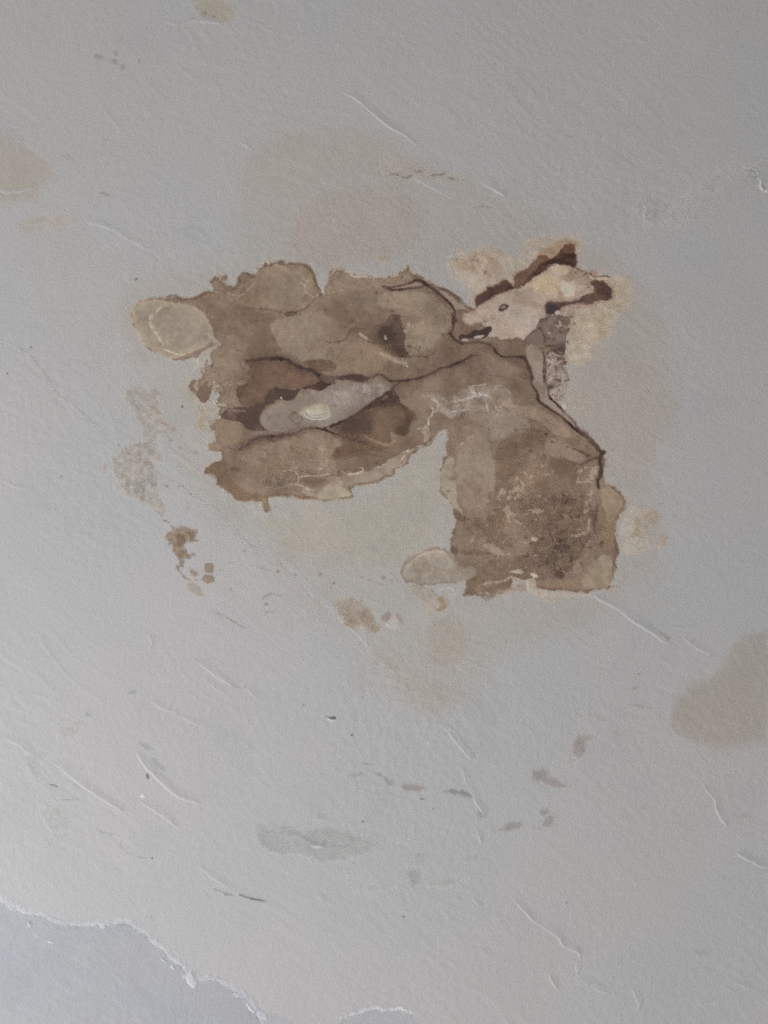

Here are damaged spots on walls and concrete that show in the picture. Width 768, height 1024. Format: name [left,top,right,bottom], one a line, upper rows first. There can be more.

damp [103,387,169,515]
damp [131,261,667,613]
crack [229,279,607,489]
flaking render [545,352,569,408]